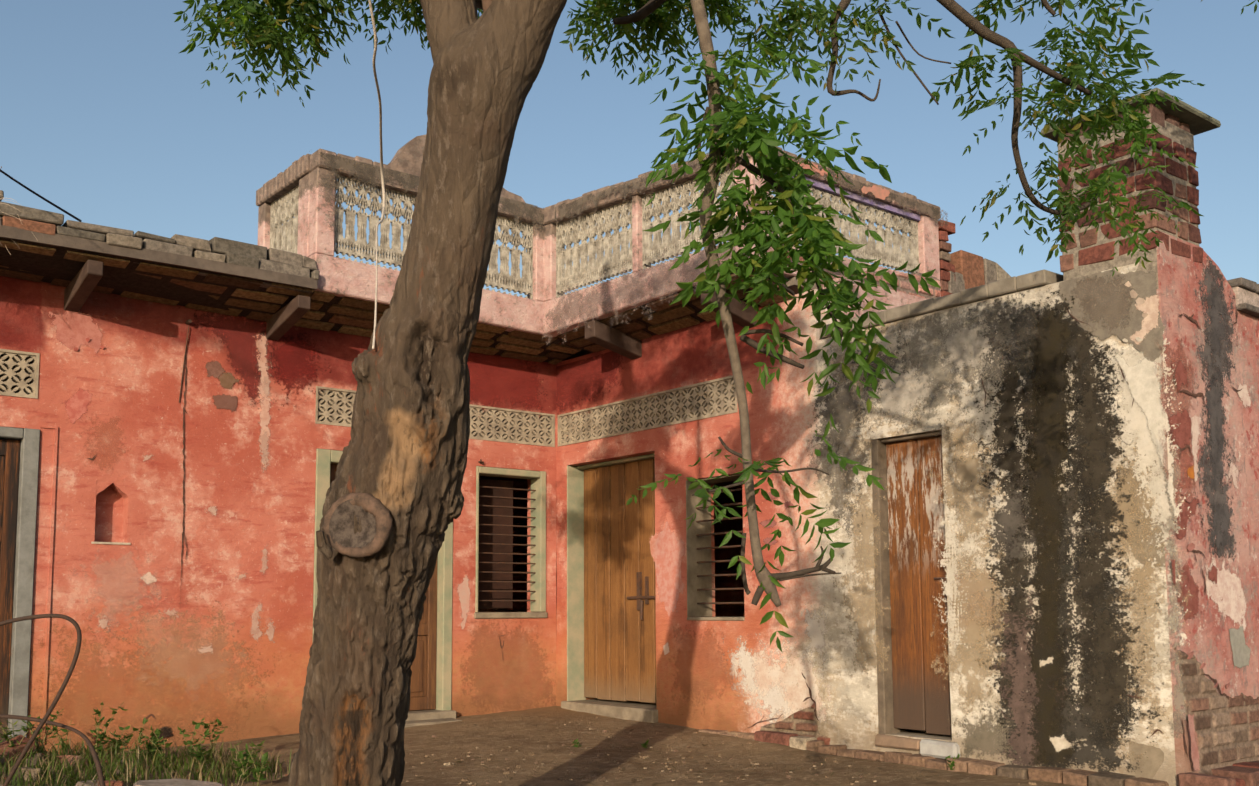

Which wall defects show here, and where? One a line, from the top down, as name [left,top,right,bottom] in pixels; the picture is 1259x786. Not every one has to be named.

peeling [205,361,240,413]
peeling [253,334,272,473]
damp [856,256,1241,772]
peeling [1115,281,1247,633]
peeling [1237,380,1251,408]
peeling [249,602,275,645]
spalling [1175,648,1259,775]